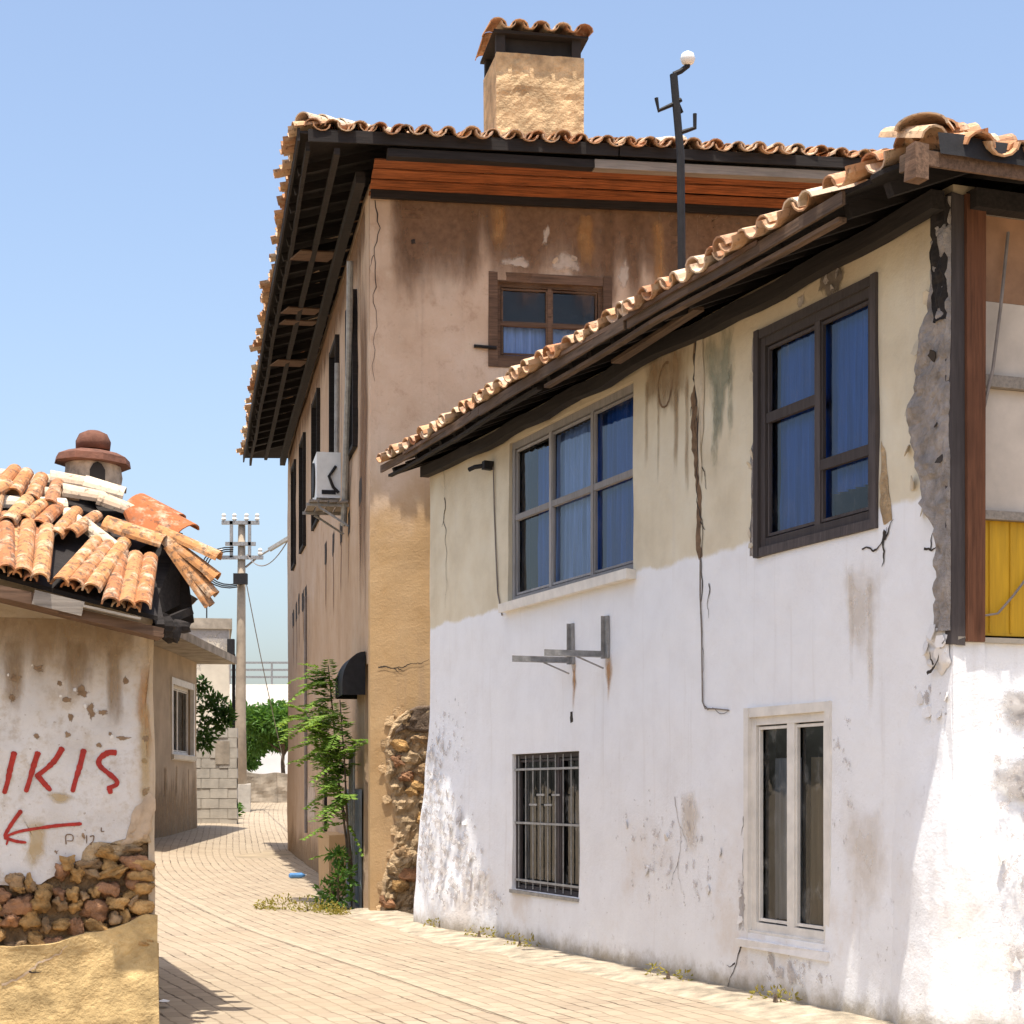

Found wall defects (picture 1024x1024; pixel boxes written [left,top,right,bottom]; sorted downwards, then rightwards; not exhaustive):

crack [370,200,380,380]
peeling [502,258,528,268]
peeling [552,254,579,271]
water stain [396,200,758,289]
water stain [708,340,730,427]
crack [690,342,710,617]
spalling [904,196,951,676]
crack [862,520,893,565]
spalling [57,681,107,737]
crack [378,659,429,672]
spalling [376,705,502,914]
spalling [0,787,156,946]